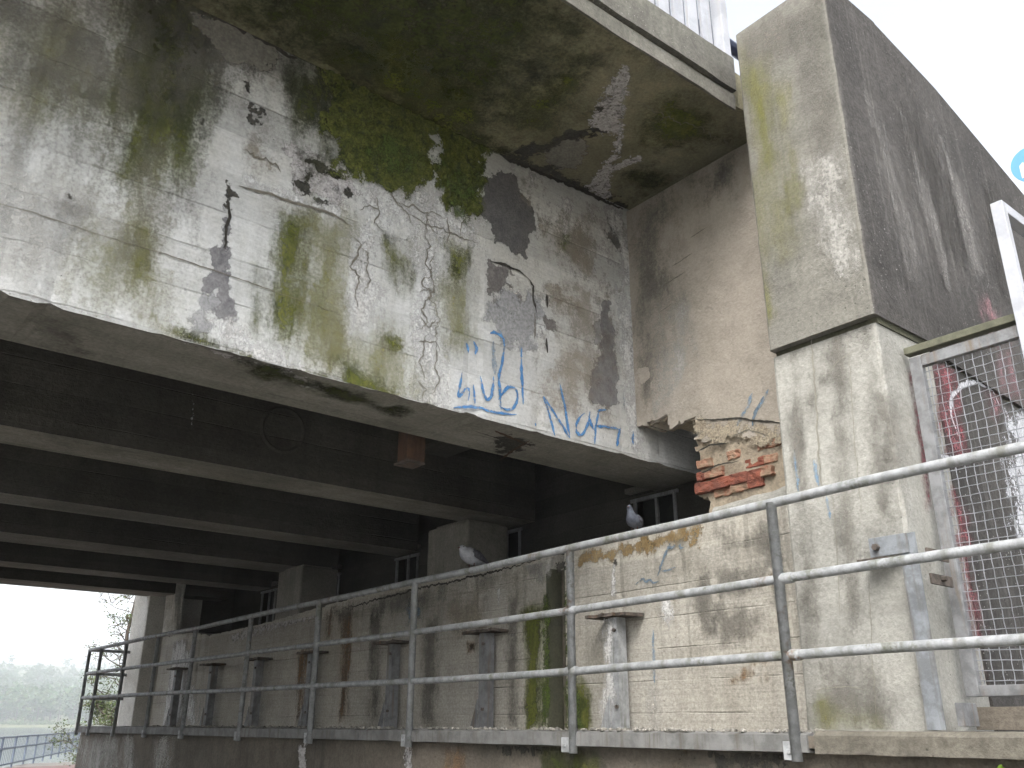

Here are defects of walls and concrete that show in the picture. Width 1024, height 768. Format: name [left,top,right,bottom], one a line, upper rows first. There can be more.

crack [0,176,479,312]
peeling [481,170,556,352]
water stain [809,156,860,268]
flaking render [693,416,782,499]
corrosion [297,649,308,716]
corrosion [326,608,353,718]